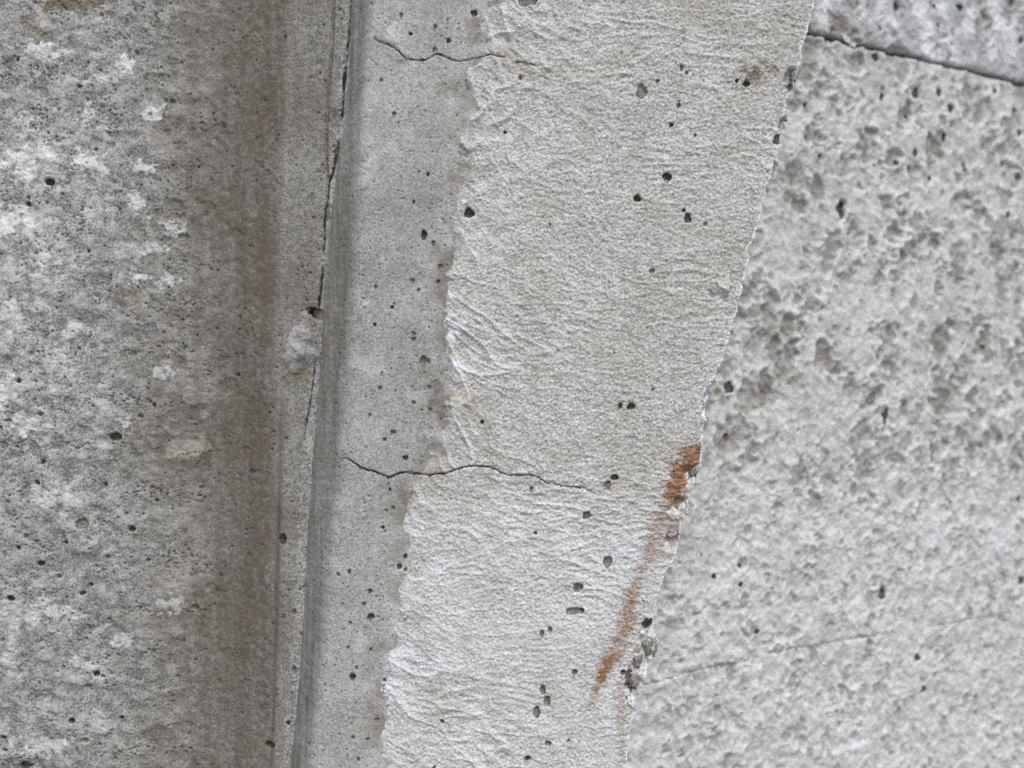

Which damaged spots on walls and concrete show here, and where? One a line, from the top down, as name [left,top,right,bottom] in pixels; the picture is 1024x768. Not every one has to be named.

crack [376,40,534,65]
spalling [786,66,800,91]
crack [318,0,352,310]
spalling [773,112,788,144]
crack [304,361,316,435]
crack [334,451,591,492]
spalling [664,467,699,548]
corrosion [585,437,703,765]
spalling [621,617,658,709]